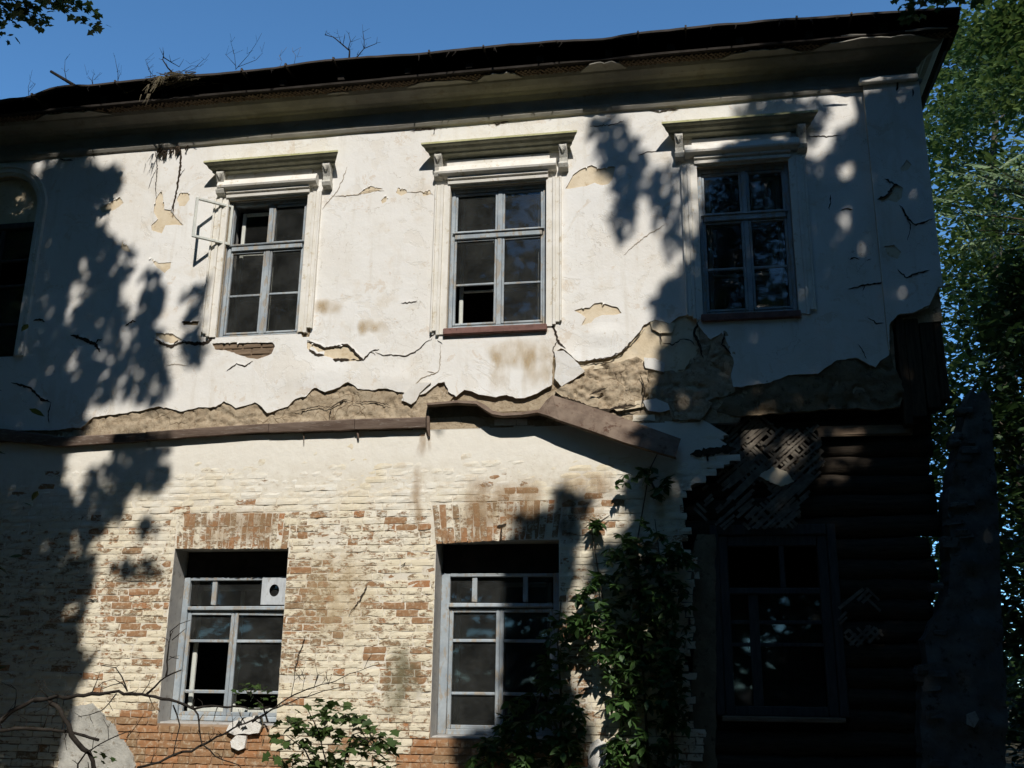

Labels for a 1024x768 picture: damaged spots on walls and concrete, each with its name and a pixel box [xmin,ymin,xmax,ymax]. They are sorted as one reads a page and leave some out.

crack [148,148,184,217]
flaking render [566,166,615,189]
flaking render [152,191,190,233]
crack [876,179,932,240]
crack [848,255,929,290]
flaking render [576,302,621,325]
flaking render [156,332,182,345]
flaking render [213,334,282,359]
flaking render [301,329,360,361]
flaking render [555,316,905,417]
flaking render [59,382,455,437]